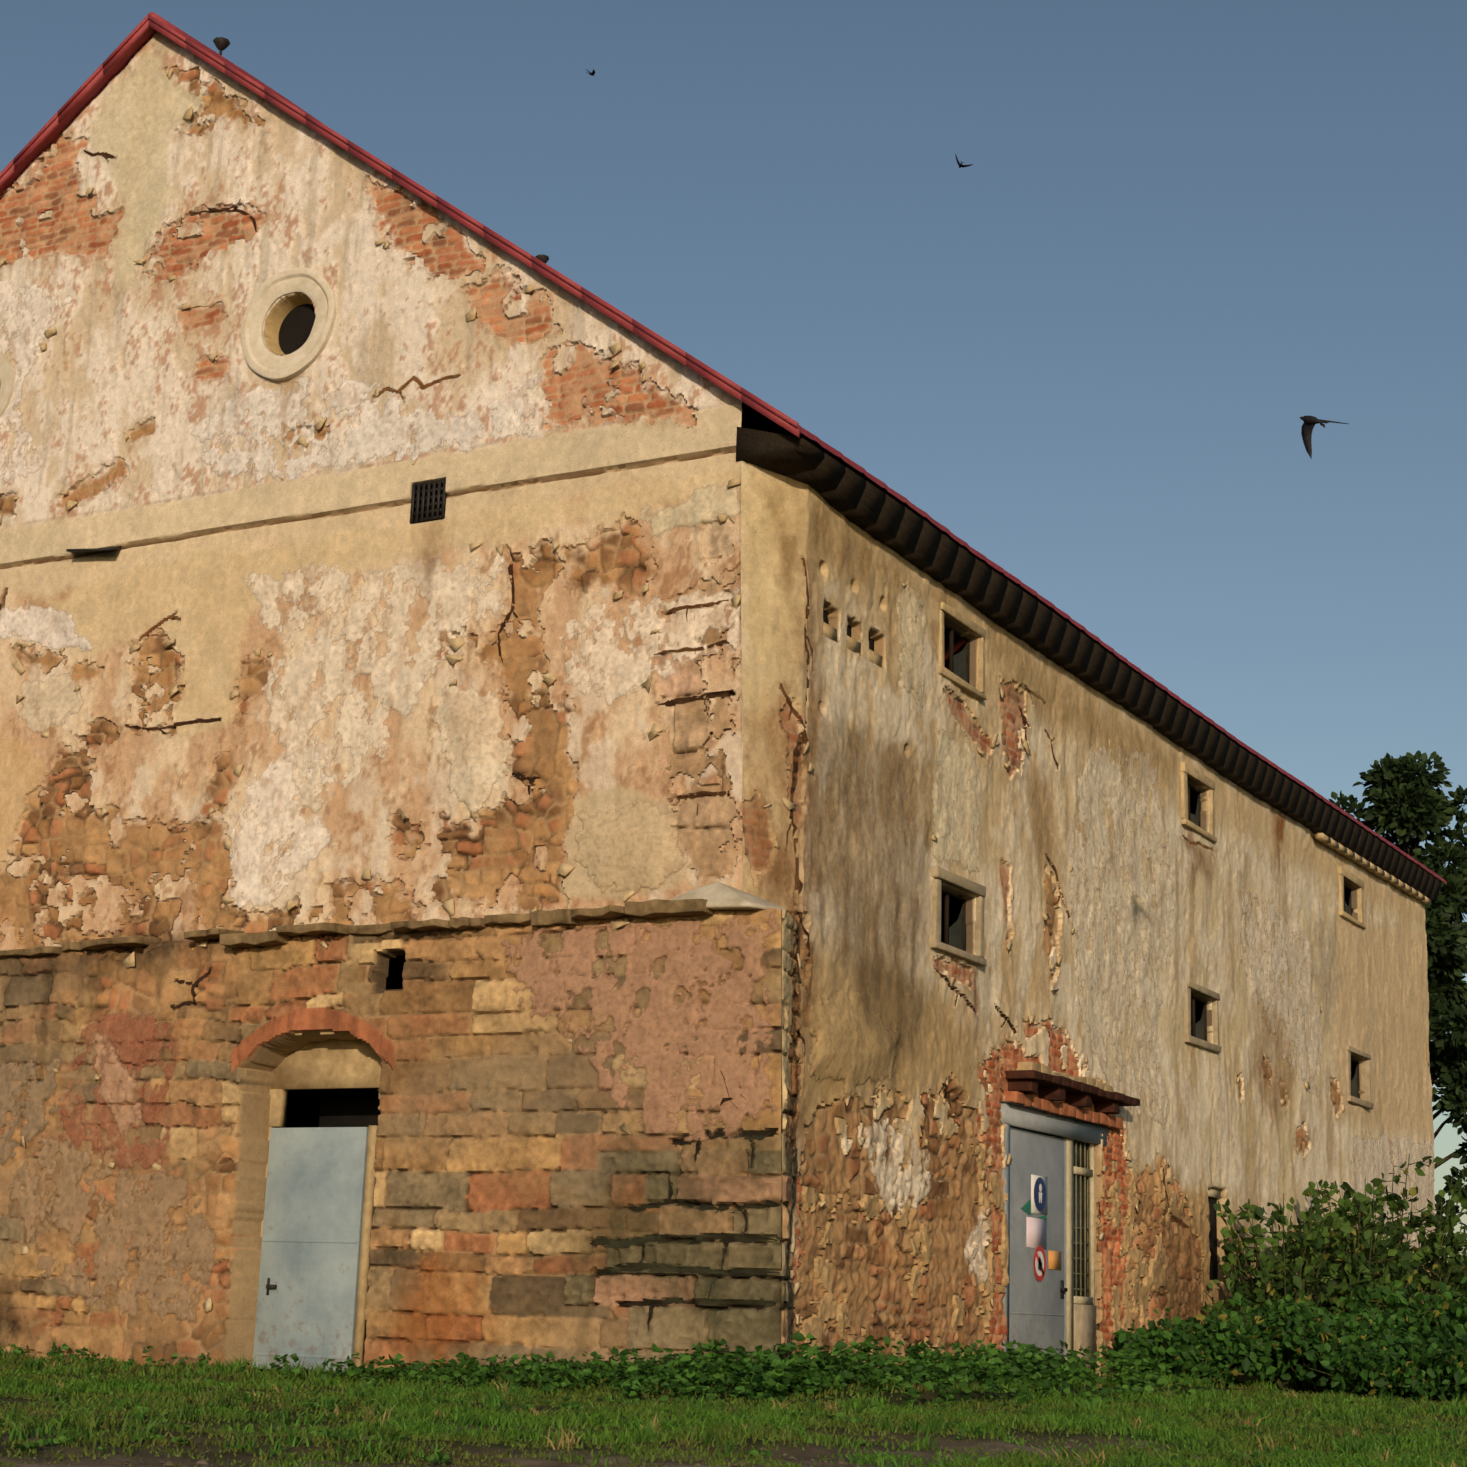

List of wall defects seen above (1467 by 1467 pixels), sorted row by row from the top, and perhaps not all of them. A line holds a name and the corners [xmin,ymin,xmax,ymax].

spalling [0,136,129,524]
spalling [133,204,266,291]
crack [374,374,461,400]
peeling [191,178,697,485]
peeling [896,582,927,714]
peeling [0,478,815,1141]
crack [590,558,813,1331]
water stain [797,736,917,965]
crack [934,967,1017,1034]
peeling [931,679,1031,872]
spalling [788,739,1204,1365]